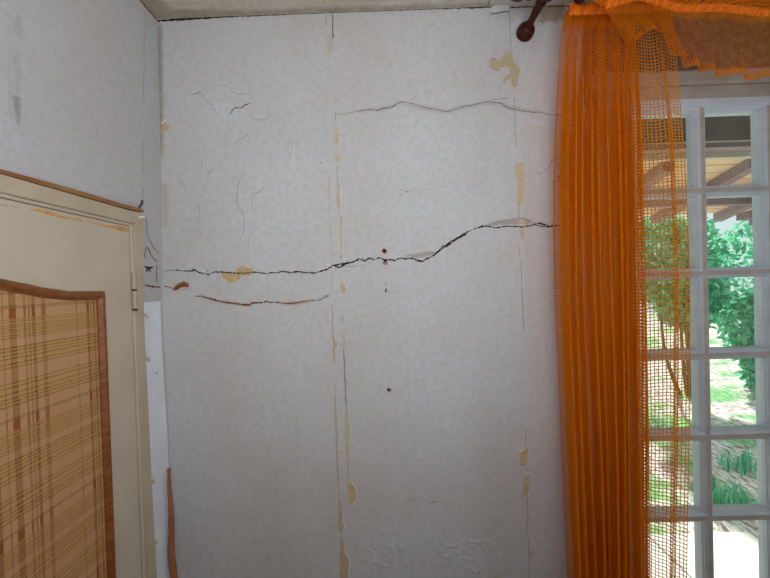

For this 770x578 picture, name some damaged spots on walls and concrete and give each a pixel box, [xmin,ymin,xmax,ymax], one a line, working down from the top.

peeling [487,50,522,90]
crack [341,97,559,117]
crack [144,215,558,282]
peeling [222,264,253,285]
crack [193,293,331,308]
peeling [338,410,358,578]